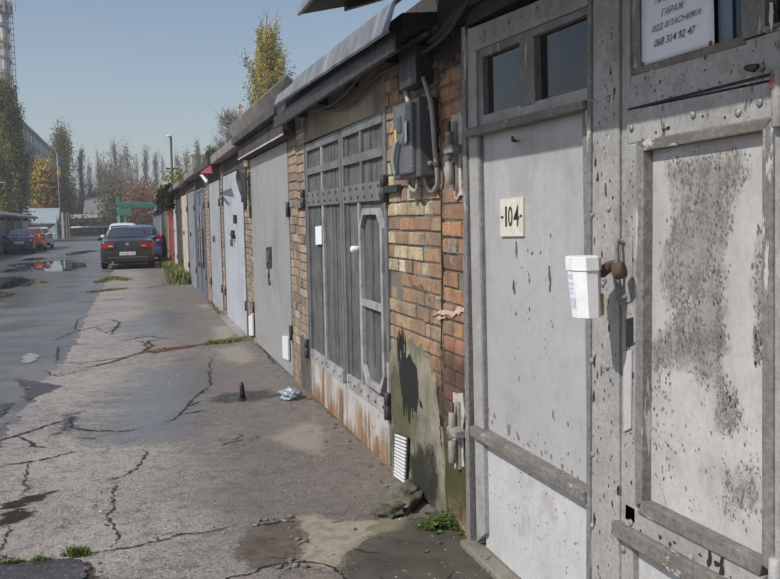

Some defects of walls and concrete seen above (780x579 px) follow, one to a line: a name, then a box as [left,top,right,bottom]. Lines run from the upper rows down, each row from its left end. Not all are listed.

crack [46,298,171,376]
peeling [651,141,752,481]
peeling [750,224,762,368]
crack [0,416,143,495]
crack [94,449,228,553]
crack [165,343,220,422]
rust [311,370,390,467]
water stain [409,446,438,504]
peeling [699,442,761,532]
crack [0,525,14,561]
crack [225,557,348,579]
peeling [234,510,495,579]